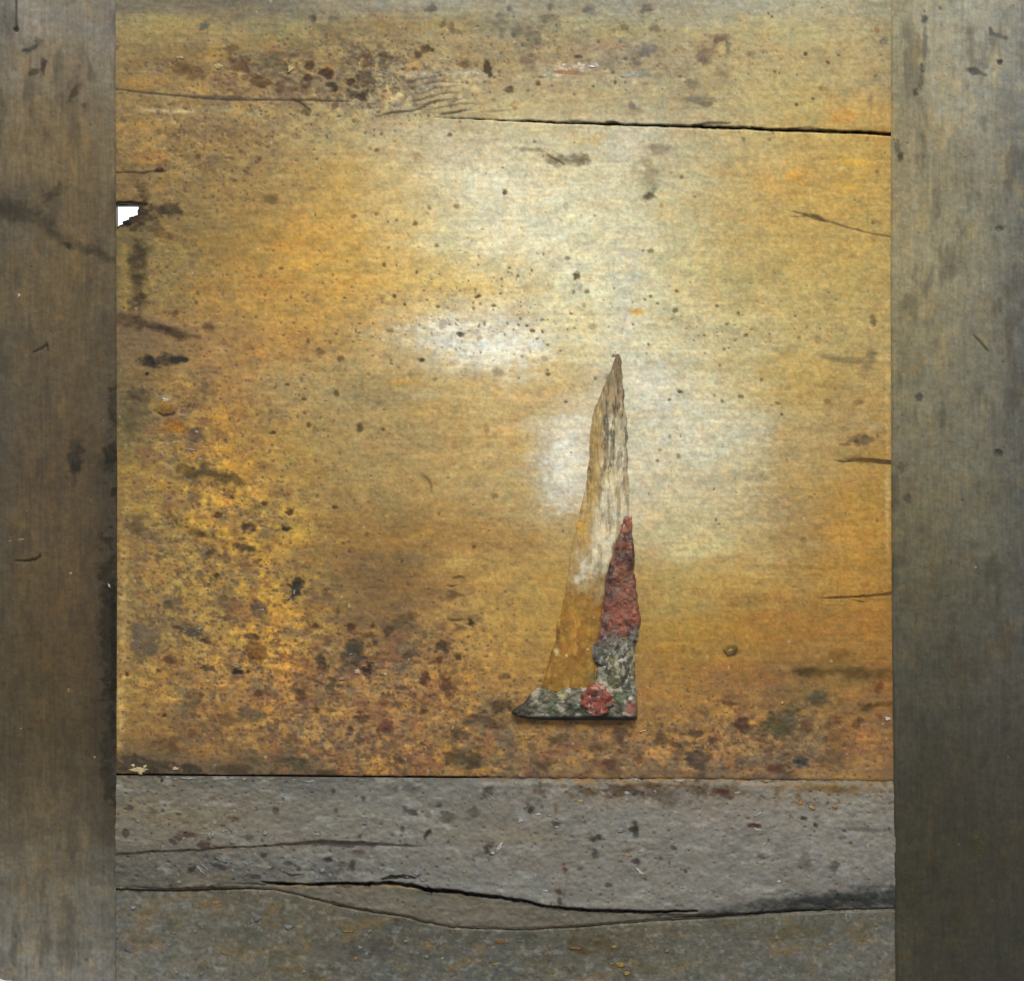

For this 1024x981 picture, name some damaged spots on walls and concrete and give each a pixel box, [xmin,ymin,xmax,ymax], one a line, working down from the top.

crack [387,76,891,136]
water stain [116,191,183,237]
water stain [118,239,184,338]
water stain [144,353,188,375]
corrosion [233,524,259,562]
corrosion [284,578,304,604]
corrosion [232,633,266,674]
corrosion [316,616,414,687]
corrosion [436,641,461,663]
corrosion [615,727,717,777]
crack [116,840,415,856]
crack [142,872,776,929]